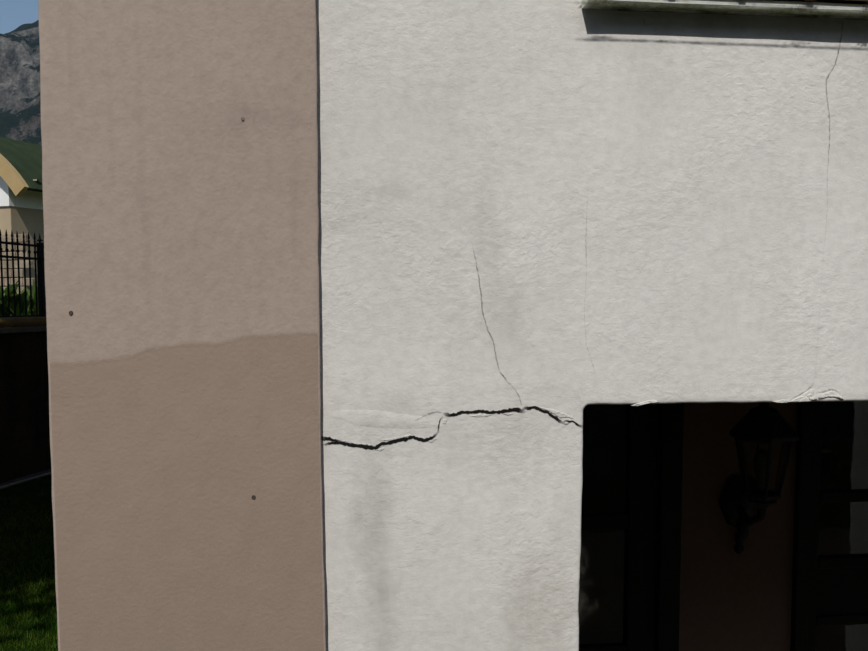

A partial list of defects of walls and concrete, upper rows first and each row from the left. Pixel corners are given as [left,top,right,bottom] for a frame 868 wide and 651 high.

spalling [773,389,844,403]
crack [321,406,580,451]